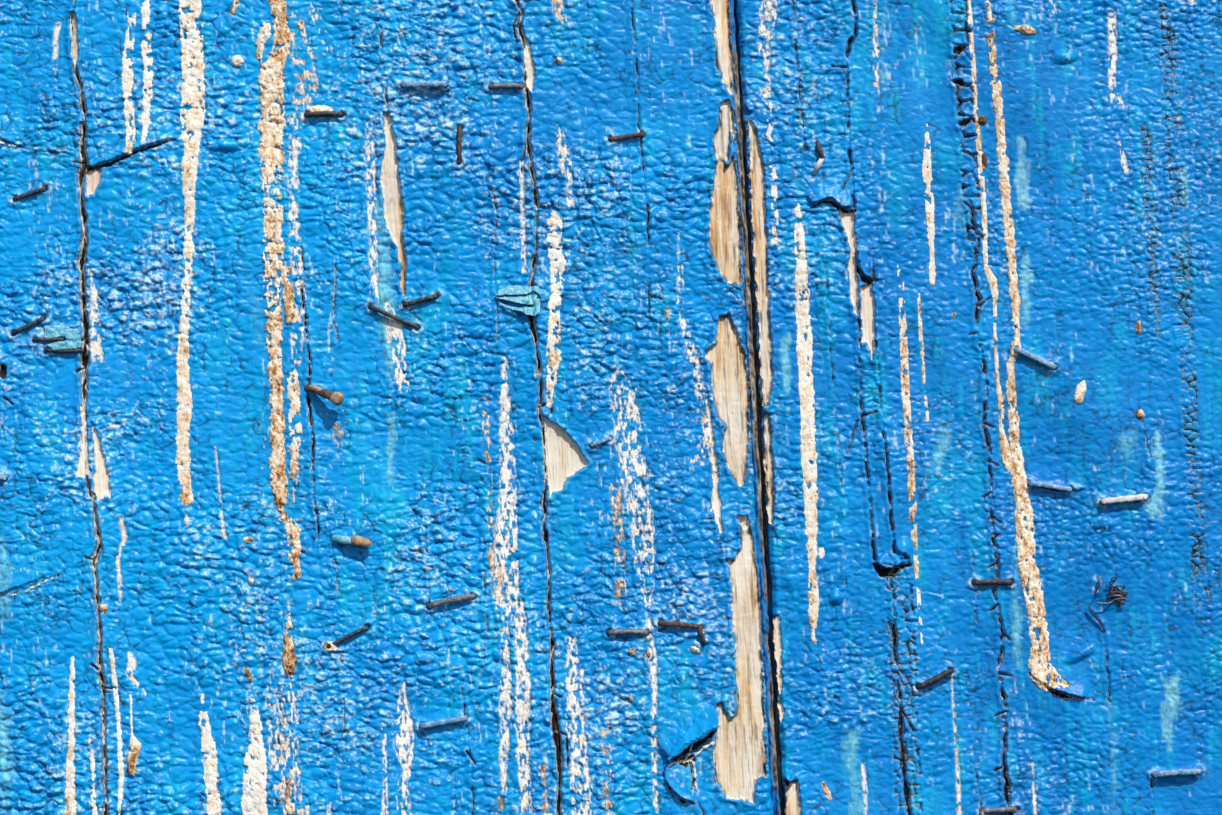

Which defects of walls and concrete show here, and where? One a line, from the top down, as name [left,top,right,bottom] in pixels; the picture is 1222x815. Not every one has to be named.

crack [0,364,13,437]
crack [0,140,28,150]
crack [0,574,61,598]
crack [66,0,176,815]
peeling [175,0,206,525]
peeling [231,0,333,580]
crack [492,0,569,815]
peeling [609,367,784,814]
peeling [676,0,780,533]
peeling [794,203,825,644]
peeling [952,0,1070,691]
crack [950,0,1111,815]